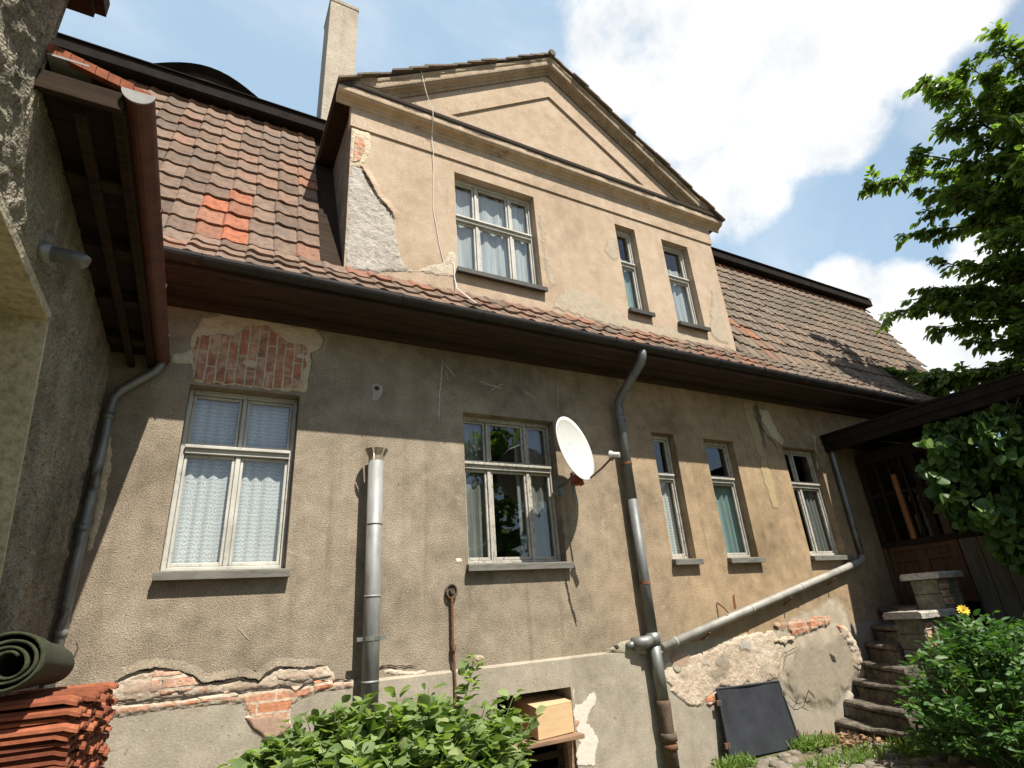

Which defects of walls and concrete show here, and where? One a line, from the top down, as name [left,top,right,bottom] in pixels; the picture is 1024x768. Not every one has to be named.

flaking render [345,128,457,277]
flaking render [172,313,329,392]
flaking render [664,598,853,707]
flaking render [95,657,356,738]
peeling [573,690,598,766]